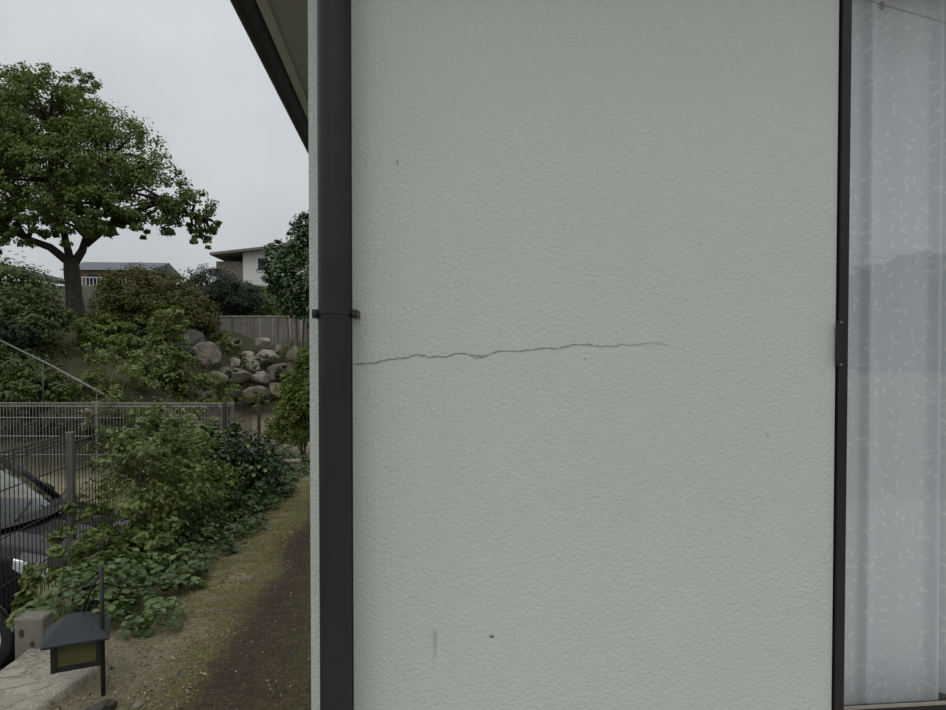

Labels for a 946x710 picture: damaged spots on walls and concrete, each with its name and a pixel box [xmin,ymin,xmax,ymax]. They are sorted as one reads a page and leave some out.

crack [353,342,667,365]